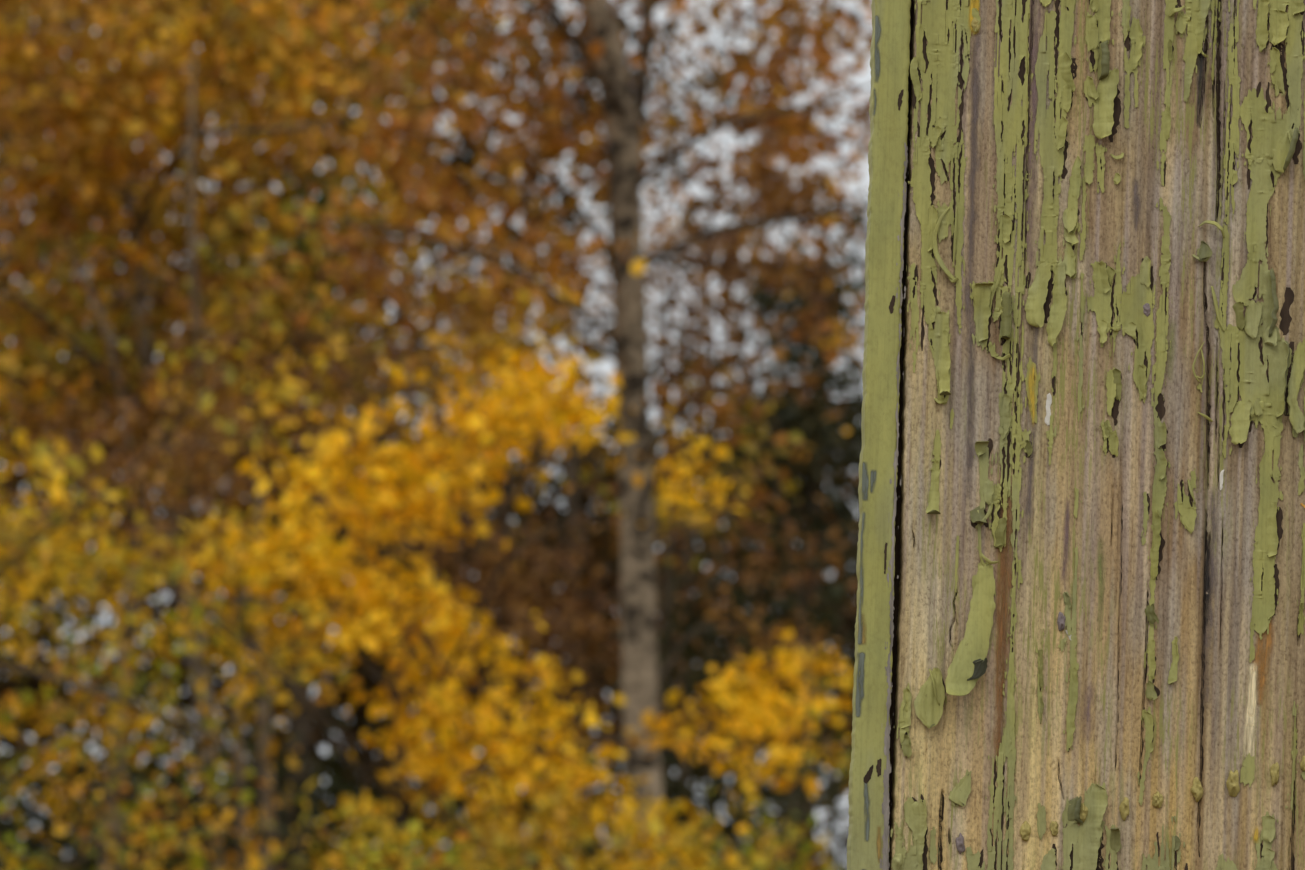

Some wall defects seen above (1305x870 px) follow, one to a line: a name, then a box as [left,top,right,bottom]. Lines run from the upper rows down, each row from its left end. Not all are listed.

peeling [856,0,1305,870]